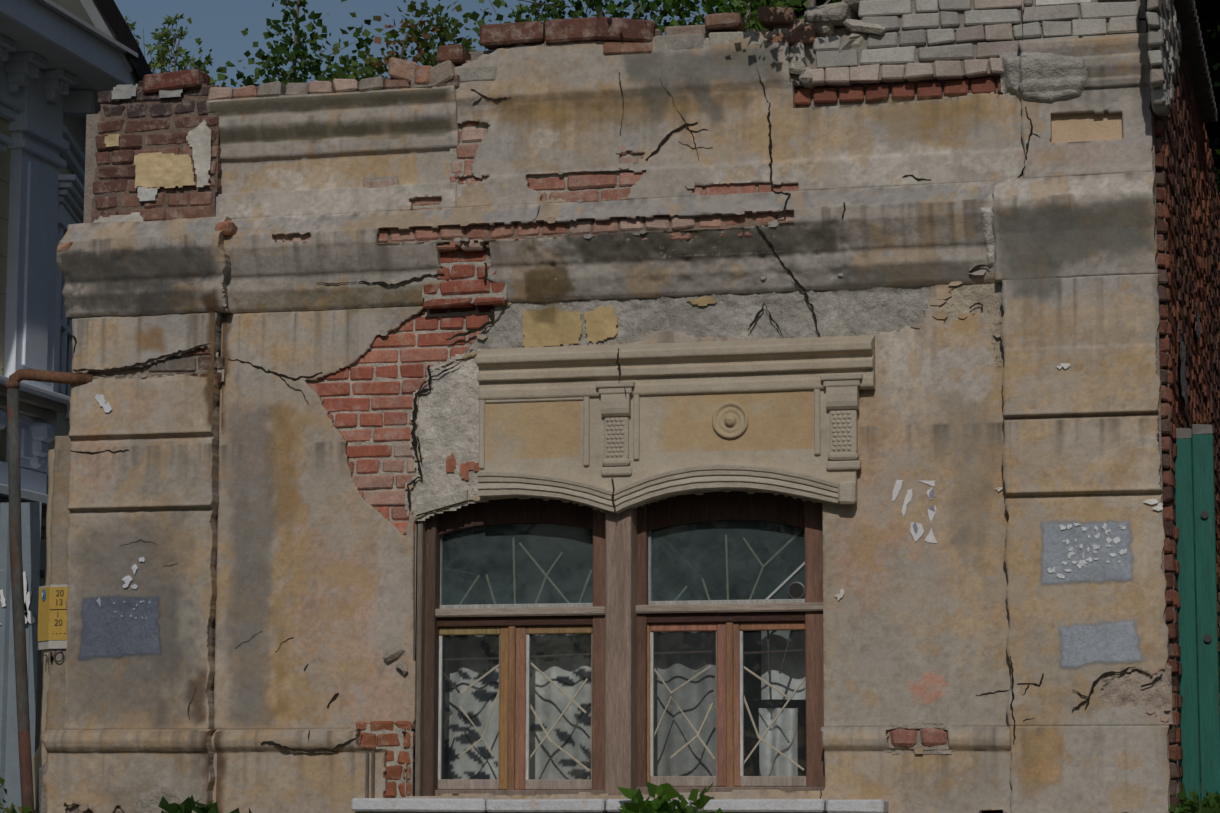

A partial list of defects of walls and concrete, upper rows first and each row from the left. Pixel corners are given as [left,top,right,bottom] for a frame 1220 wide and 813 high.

spalling [91,81,221,223]
spalling [450,119,490,185]
spalling [527,146,646,203]
crack [645,78,713,161]
crack [756,75,820,337]
crack [72,335,322,405]
spalling [307,179,1003,536]
crack [261,693,362,753]
spalling [355,721,415,798]
crack [976,656,1044,744]
crack [1072,666,1162,712]
spalling [65,800,93,813]